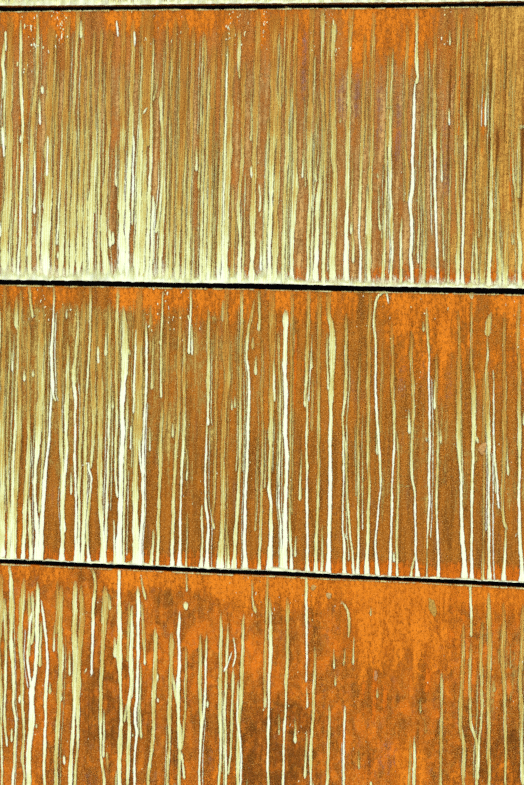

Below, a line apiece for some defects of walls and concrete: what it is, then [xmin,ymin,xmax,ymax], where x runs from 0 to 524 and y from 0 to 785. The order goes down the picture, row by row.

corrosion [0,11,86,43]
corrosion [104,10,238,45]
damp [0,7,524,287]
corrosion [333,8,446,80]
corrosion [447,14,506,205]
corrosion [509,122,524,211]
corrosion [108,287,254,328]
corrosion [267,267,358,408]
corrosion [370,233,524,397]
damp [0,289,524,785]
corrosion [0,505,524,720]
corrosion [390,733,427,785]